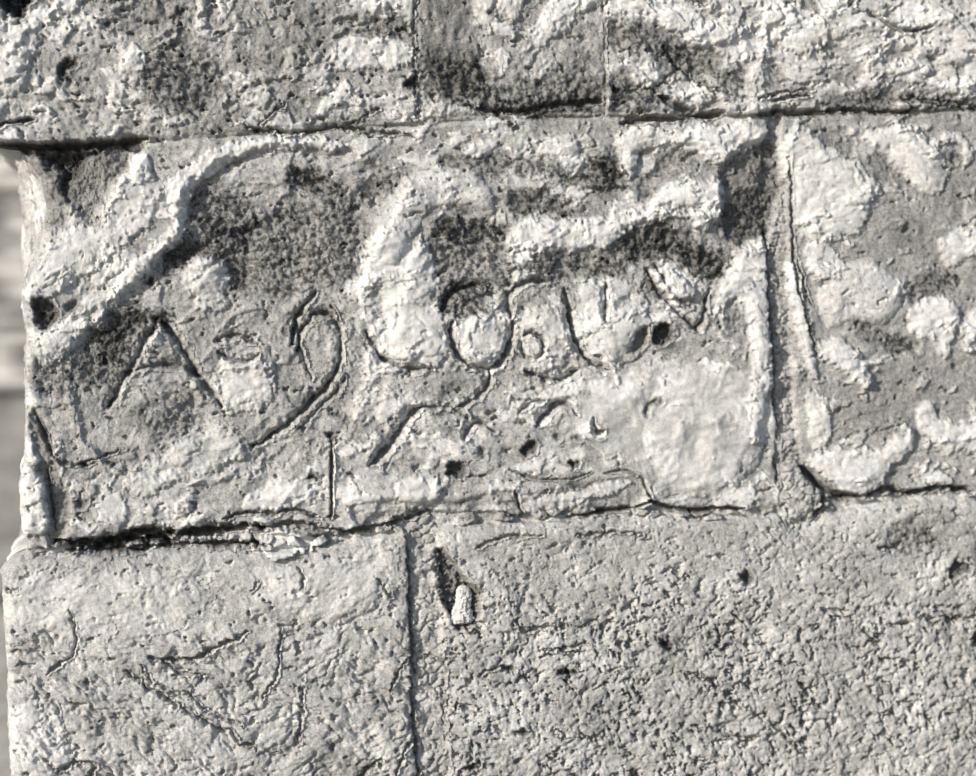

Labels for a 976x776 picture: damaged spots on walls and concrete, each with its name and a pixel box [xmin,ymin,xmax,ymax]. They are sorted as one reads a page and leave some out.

peeling [0,0,96,115]
peeling [116,41,147,76]
spalling [432,546,522,648]